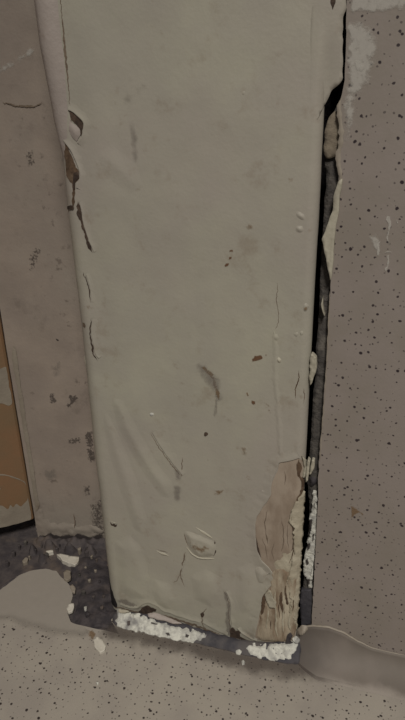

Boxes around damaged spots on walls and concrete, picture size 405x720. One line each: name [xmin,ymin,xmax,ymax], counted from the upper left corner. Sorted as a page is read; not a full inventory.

crack [76,201,98,252]
peeling [322,179,343,280]
crack [83,273,102,372]
spalling [115,448,315,644]
leakage [108,627,310,674]